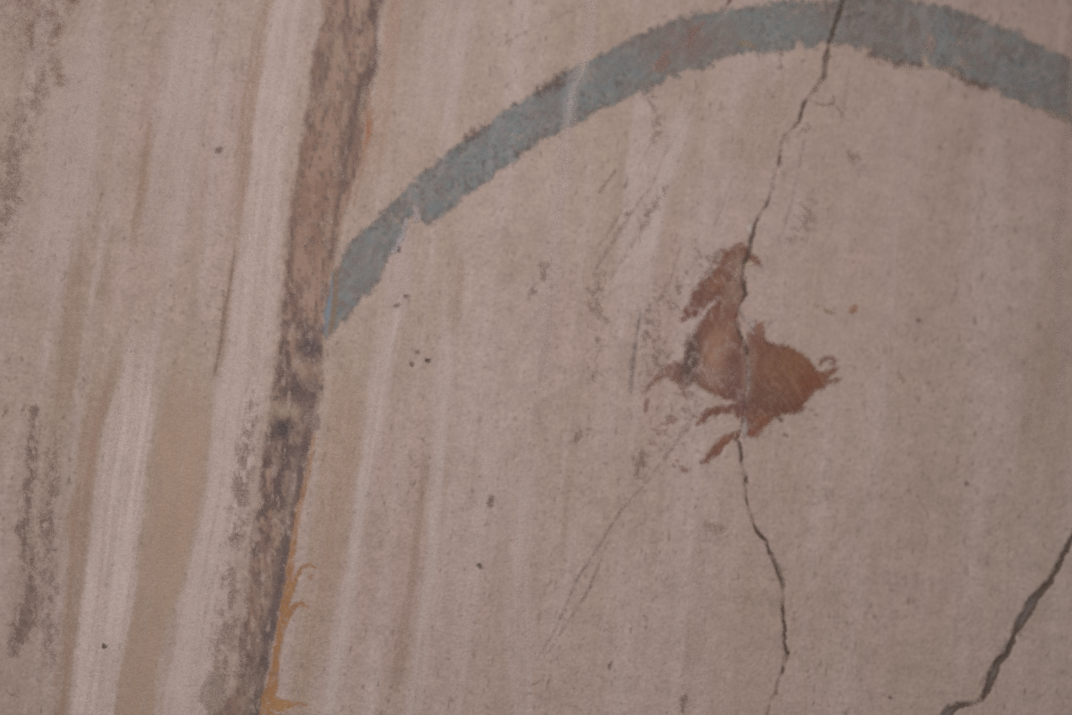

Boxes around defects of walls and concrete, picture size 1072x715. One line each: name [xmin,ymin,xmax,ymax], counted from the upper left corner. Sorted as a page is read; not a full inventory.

crack [736,0,845,707]
crack [942,535,1072,715]